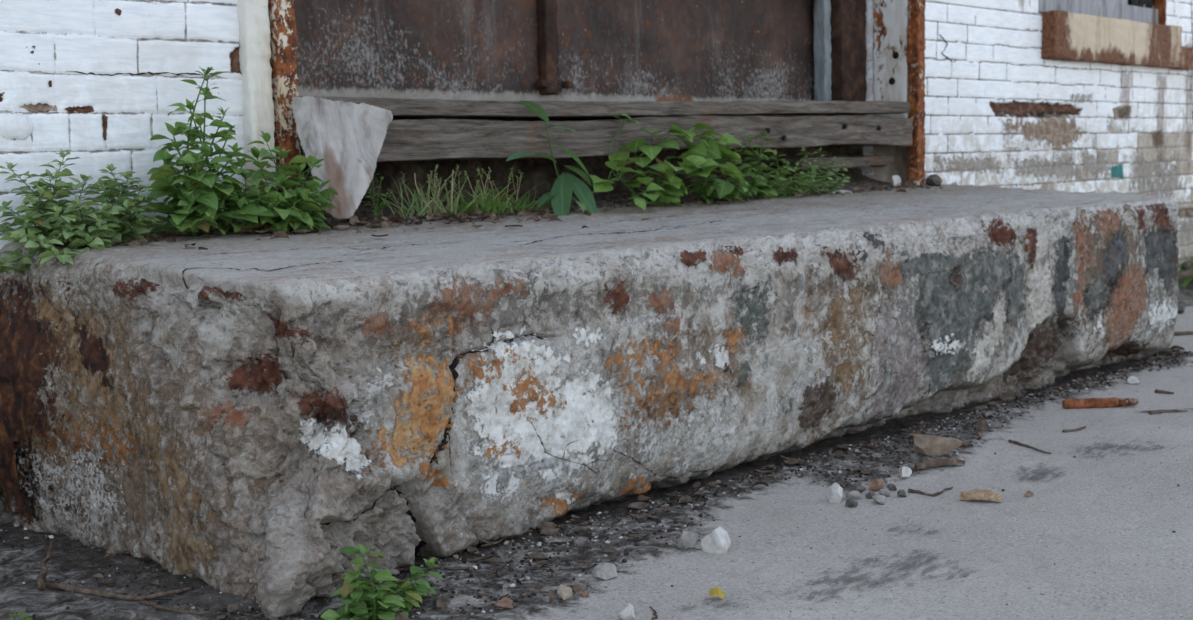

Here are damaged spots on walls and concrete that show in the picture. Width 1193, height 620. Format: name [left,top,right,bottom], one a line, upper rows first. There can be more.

spalling [16,104,108,141]
spalling [989,93,1093,118]
rust [0,273,217,584]
rust [354,275,567,424]
crack [430,324,553,474]
rust [470,434,524,467]
rust [597,281,630,320]
rust [605,289,750,445]
rust [1070,208,1122,310]
rust [1103,260,1148,353]
rust [1134,202,1180,279]
crack [320,485,427,556]